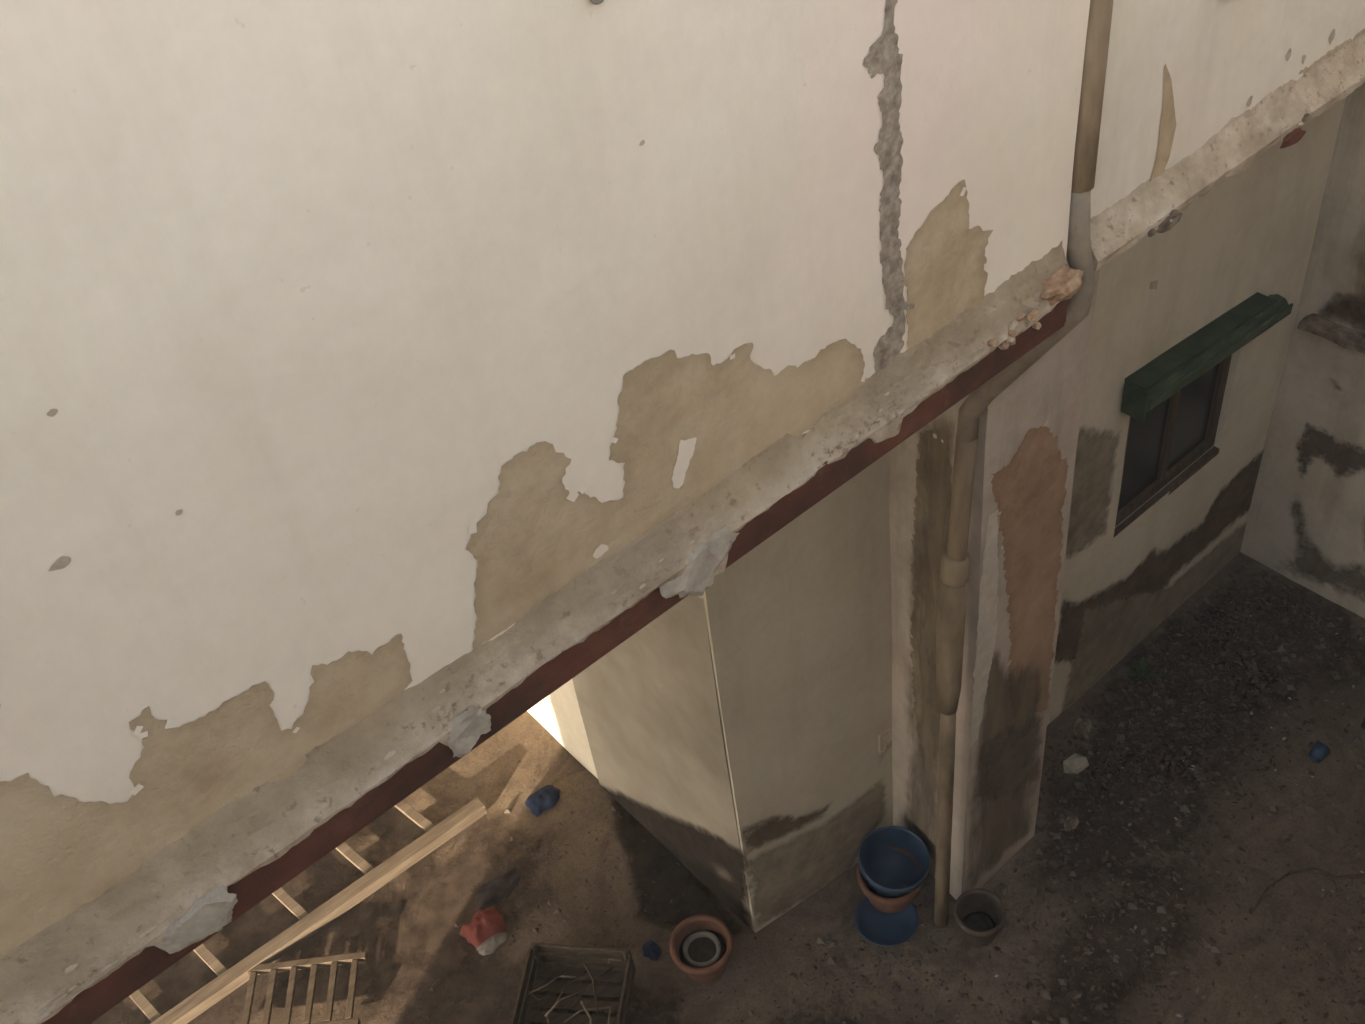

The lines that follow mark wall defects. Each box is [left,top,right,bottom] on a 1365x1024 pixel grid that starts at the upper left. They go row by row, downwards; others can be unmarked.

flaking render [903,180,993,351]
spalling [987,264,1085,350]
spalling [49,556,71,571]
flaking render [466,339,867,650]
flaking render [909,429,944,734]
flaking render [991,420,1069,713]
damp [1066,429,1117,557]
damp [1054,450,1264,663]
flaking render [0,634,413,972]
flaking render [432,689,491,758]
damp [602,787,829,936]